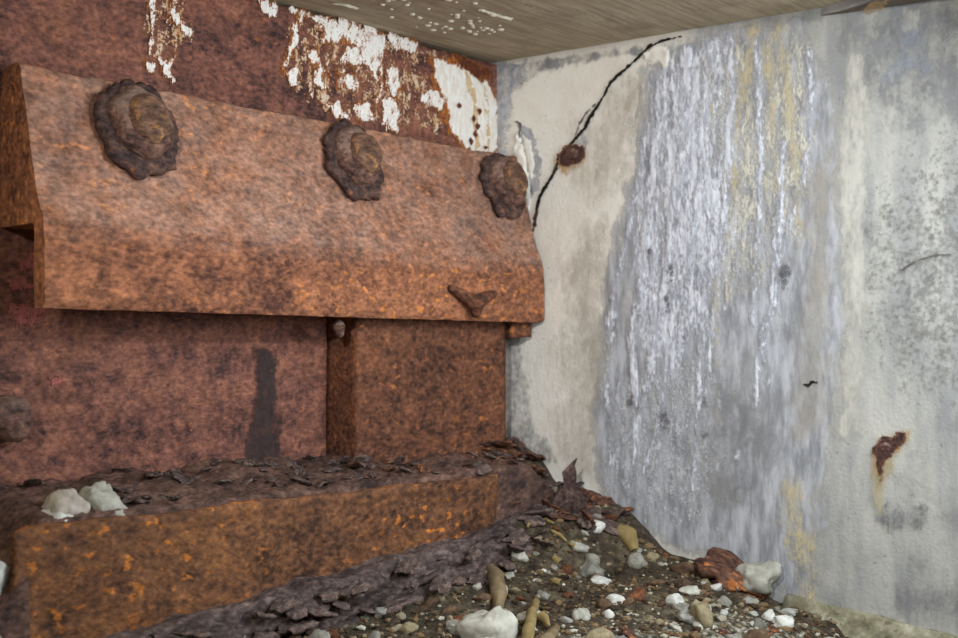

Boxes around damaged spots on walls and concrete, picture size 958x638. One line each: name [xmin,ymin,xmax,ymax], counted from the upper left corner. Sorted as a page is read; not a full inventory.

corrosion [555,133,588,175]
crack [532,36,682,232]
crack [901,254,951,271]
water stain [571,9,958,600]
corrosion [23,478,66,488]
corrosion [111,485,154,506]
corrosion [209,454,441,495]
corrosion [462,448,527,475]
corrosion [871,431,912,508]
corrosion [96,515,533,638]